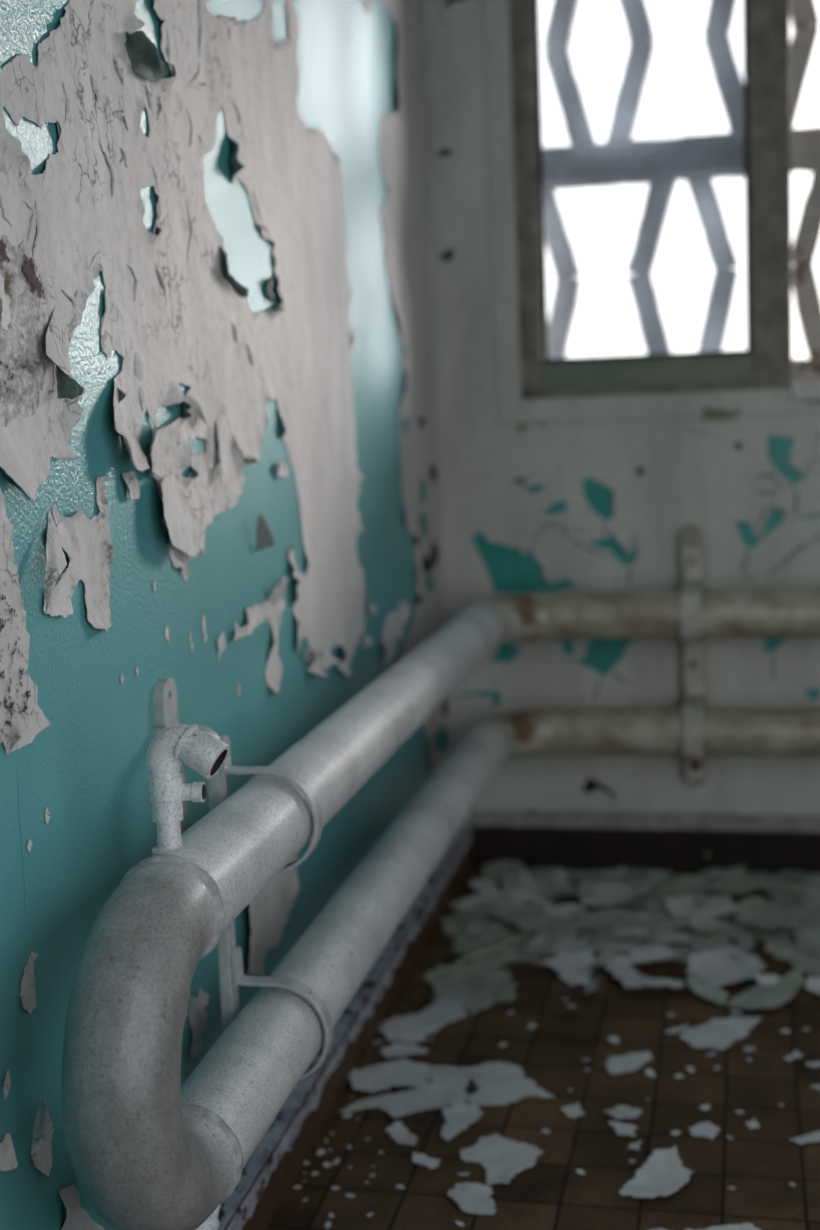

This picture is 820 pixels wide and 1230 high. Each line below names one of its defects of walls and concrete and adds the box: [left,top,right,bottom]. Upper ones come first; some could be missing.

damp [0,238,46,306]
peeling [0,0,377,678]
peeling [767,434,820,485]
peeling [583,476,642,564]
peeling [736,501,792,549]
peeling [471,532,580,593]
peeling [0,488,50,755]
peeling [490,643,522,663]
peeling [562,639,638,675]